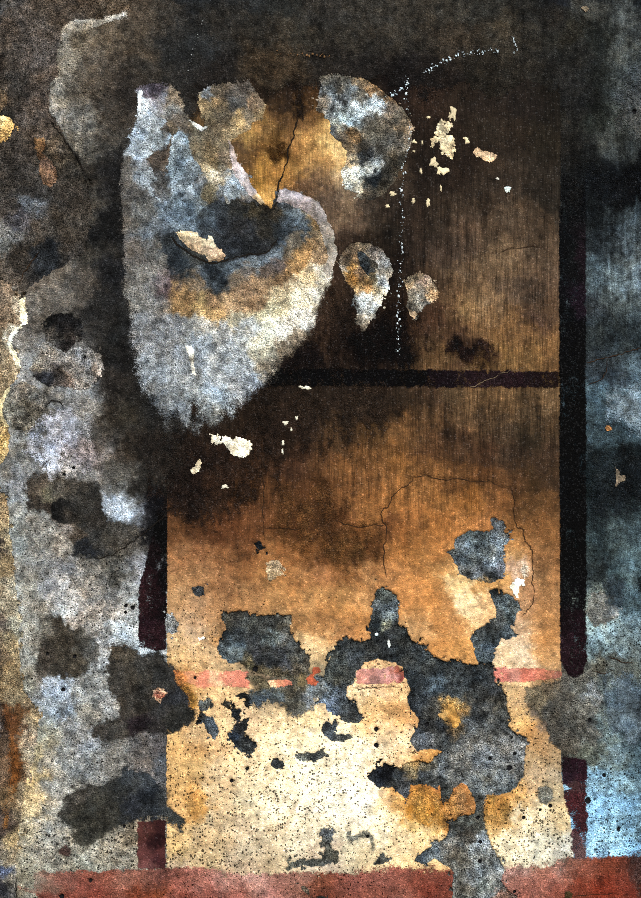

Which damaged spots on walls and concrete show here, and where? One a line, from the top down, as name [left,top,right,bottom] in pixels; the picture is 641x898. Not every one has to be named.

crack [274,118,298,209]
spalling [312,73,497,208]
water stain [614,65,641,140]
spalling [0,0,140,464]
spalling [119,78,393,458]
efflorescence [25,403,98,481]
spalling [22,466,146,561]
water stain [265,560,286,581]
crack [335,475,535,615]
water stain [587,385,641,526]
spalling [0,487,530,898]
water stain [597,671,641,746]